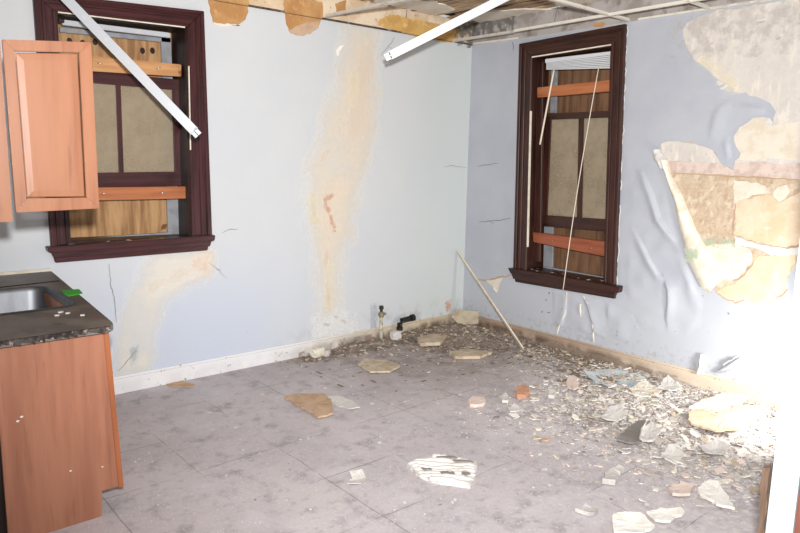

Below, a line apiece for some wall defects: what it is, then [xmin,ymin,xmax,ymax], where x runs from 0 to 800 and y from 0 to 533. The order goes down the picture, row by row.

flaking render [208,0,249,27]
flaking render [283,0,323,36]
flaking render [378,14,462,43]
leakage [310,28,384,345]
spalling [661,0,800,304]
leakage [116,250,216,374]